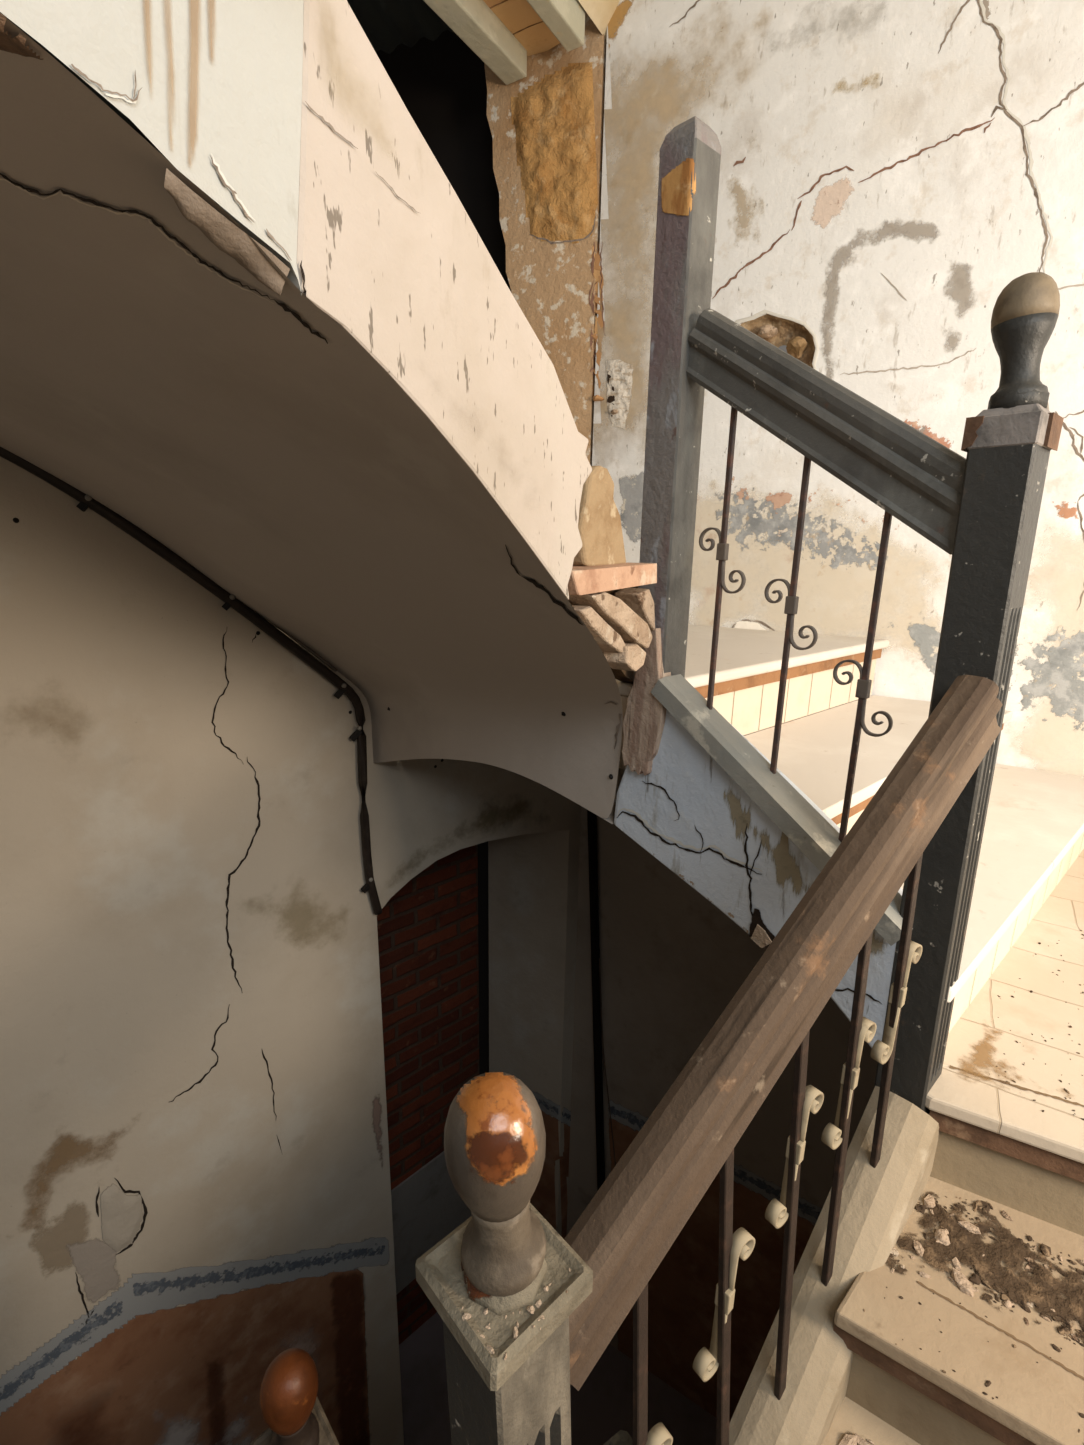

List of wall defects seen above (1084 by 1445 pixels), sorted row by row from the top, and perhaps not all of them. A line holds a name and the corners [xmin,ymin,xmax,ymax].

spalling [608,0,632,47]
spalling [511,62,599,244]
crack [712,0,1084,299]
crack [0,153,328,344]
spalling [592,359,633,429]
flaking render [573,466,644,566]
crack [1047,404,1084,538]
spalling [568,586,655,683]
peeling [1009,538,1084,777]
crack [170,631,261,1102]
crack [617,781,762,915]
leakage [24,1134,116,1226]